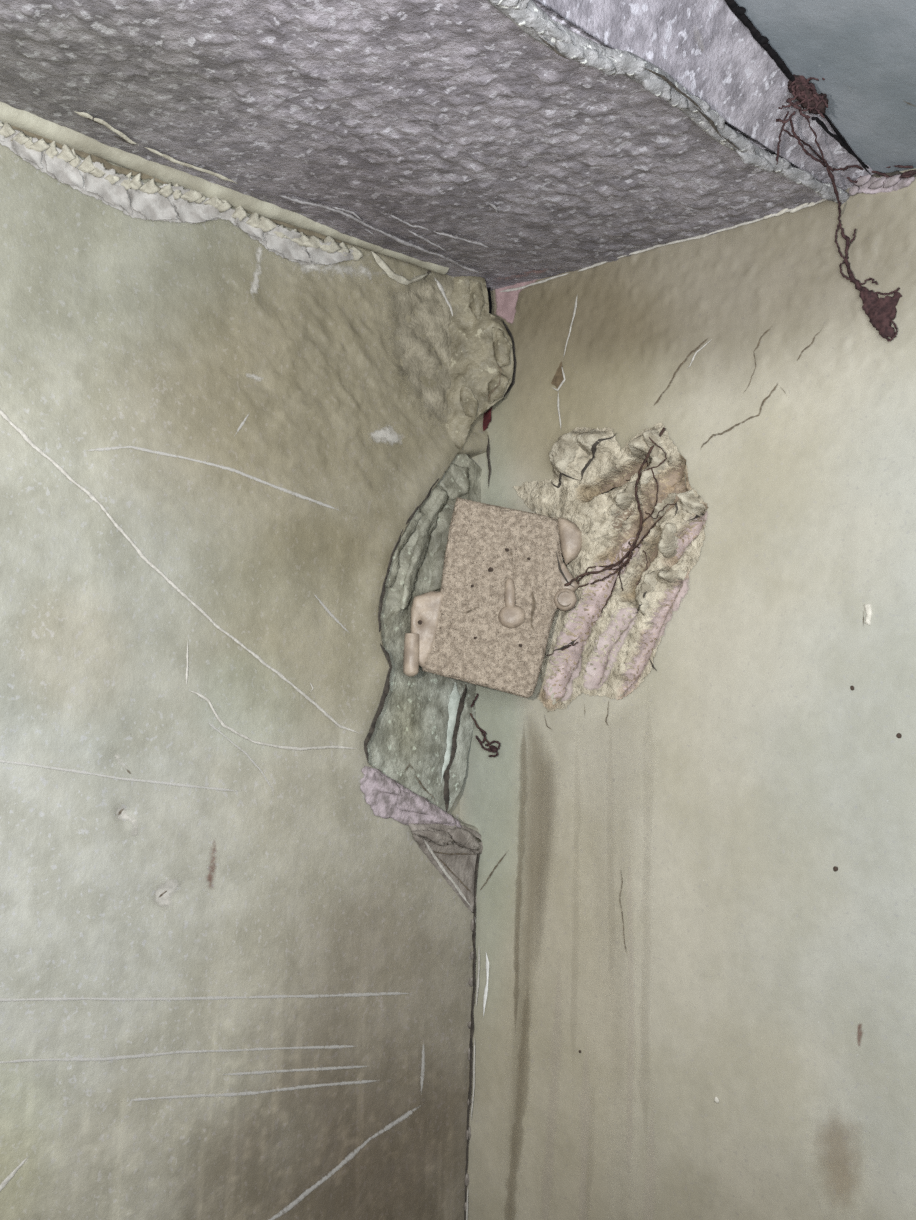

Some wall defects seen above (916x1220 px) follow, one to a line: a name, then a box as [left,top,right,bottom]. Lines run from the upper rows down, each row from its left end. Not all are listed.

crack [725,0,795,82]
peeling [0,111,371,293]
crack [551,199,826,428]
crack [701,329,784,448]
spalling [360,454,483,913]
spalling [512,423,708,729]